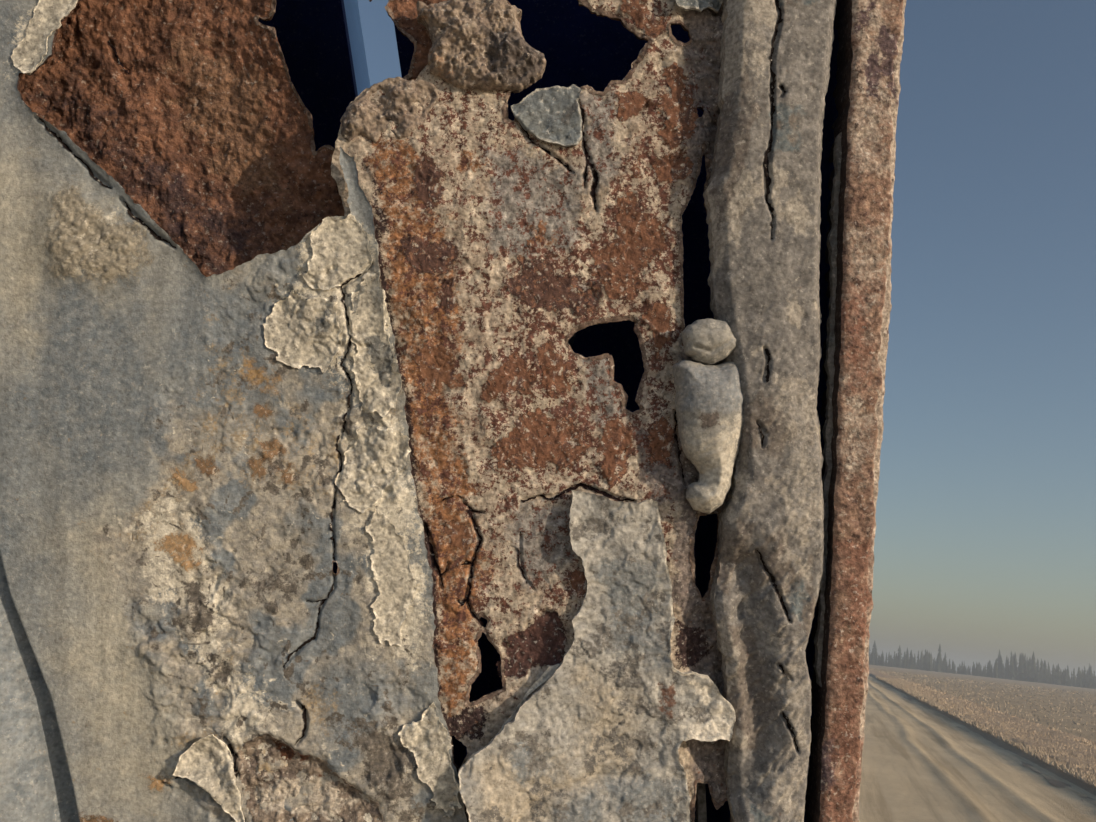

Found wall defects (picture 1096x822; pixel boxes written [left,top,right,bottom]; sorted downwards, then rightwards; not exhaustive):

crack [38,118,176,248]
rust [411,154,446,216]
peeling [511,84,582,147]
crack [763,0,787,239]
rust [503,190,673,359]
crack [283,263,373,668]
peeling [263,214,417,646]
crack [425,495,484,626]
rust [480,342,633,488]
crack [521,483,635,503]
rust [805,0,906,822]
spalling [489,611,567,743]